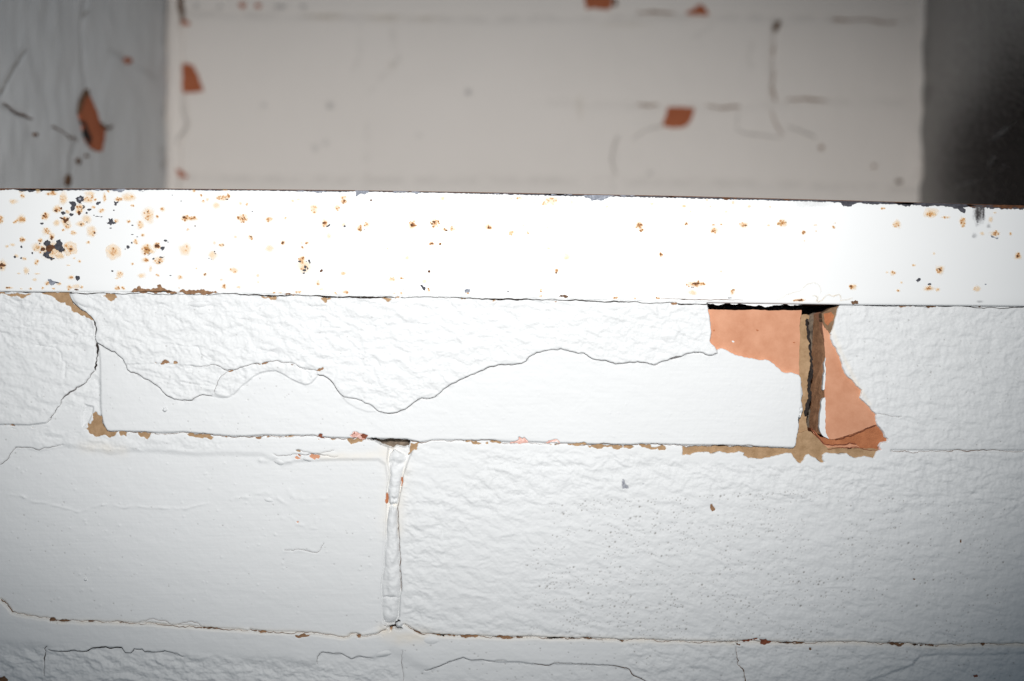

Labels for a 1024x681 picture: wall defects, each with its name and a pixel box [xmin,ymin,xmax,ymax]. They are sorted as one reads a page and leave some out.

spalling [182,63,204,93]
spalling [75,89,113,164]
spalling [663,107,694,128]
rust [0,191,181,290]
peeling [0,292,94,321]
crack [0,292,728,465]
spalling [682,300,886,463]
peeling [87,412,151,439]
spalling [317,432,419,454]
peeling [550,442,666,450]
crack [1,599,381,668]
crack [401,625,499,680]